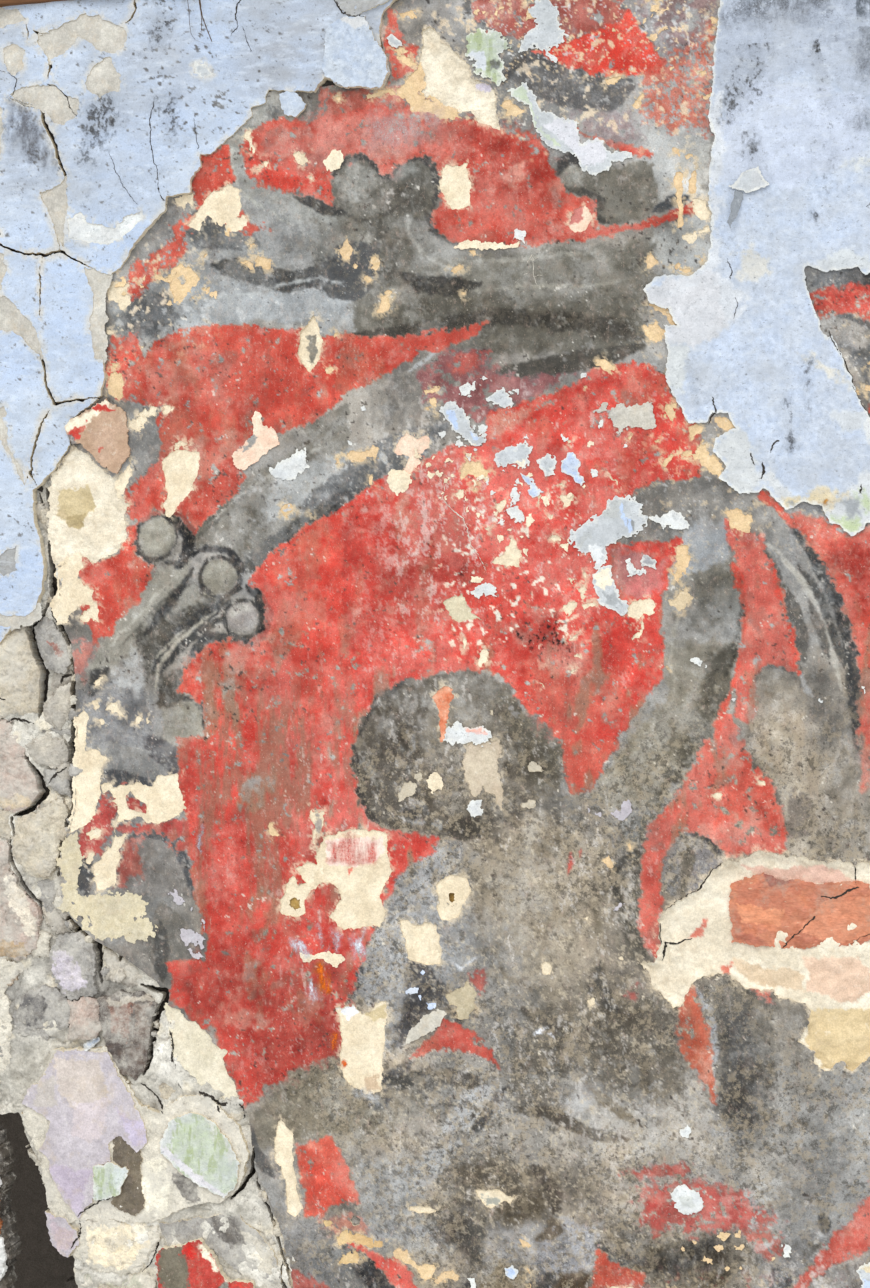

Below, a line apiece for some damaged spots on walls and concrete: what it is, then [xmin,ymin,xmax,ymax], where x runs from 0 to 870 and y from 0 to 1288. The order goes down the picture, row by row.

crack [9,66,77,175]
crack [109,102,167,205]
crack [0,234,89,267]
crack [31,360,100,492]
spalling [0,253,217,631]
peeling [335,376,735,640]
crack [0,564,72,724]
crack [17,728,76,816]
spalling [280,809,392,930]
spalling [400,875,477,1044]
spalling [641,850,870,1071]
spalling [336,1001,388,1094]